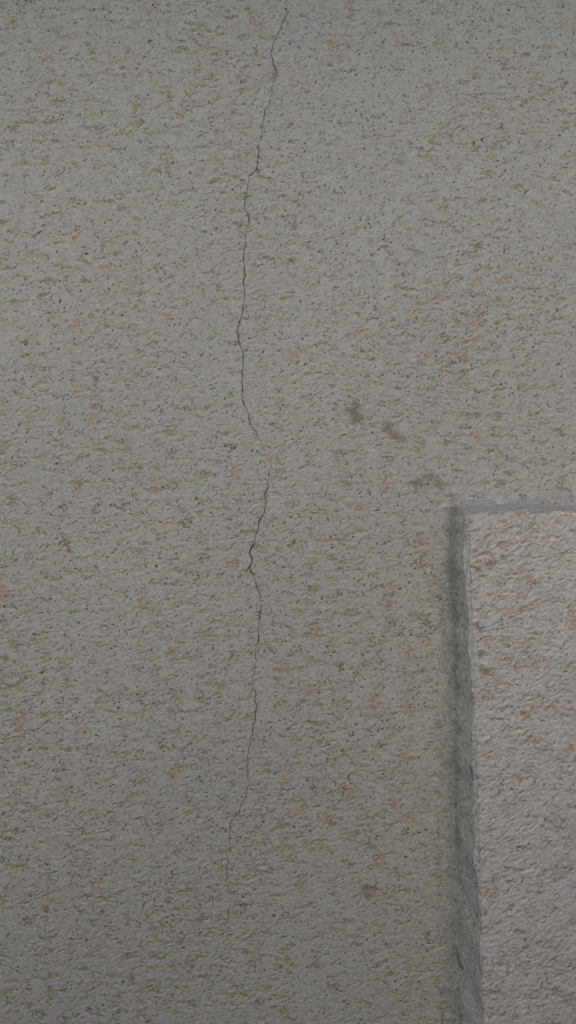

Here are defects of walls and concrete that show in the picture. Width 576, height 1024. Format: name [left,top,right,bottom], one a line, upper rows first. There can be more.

crack [228,1,288,840]